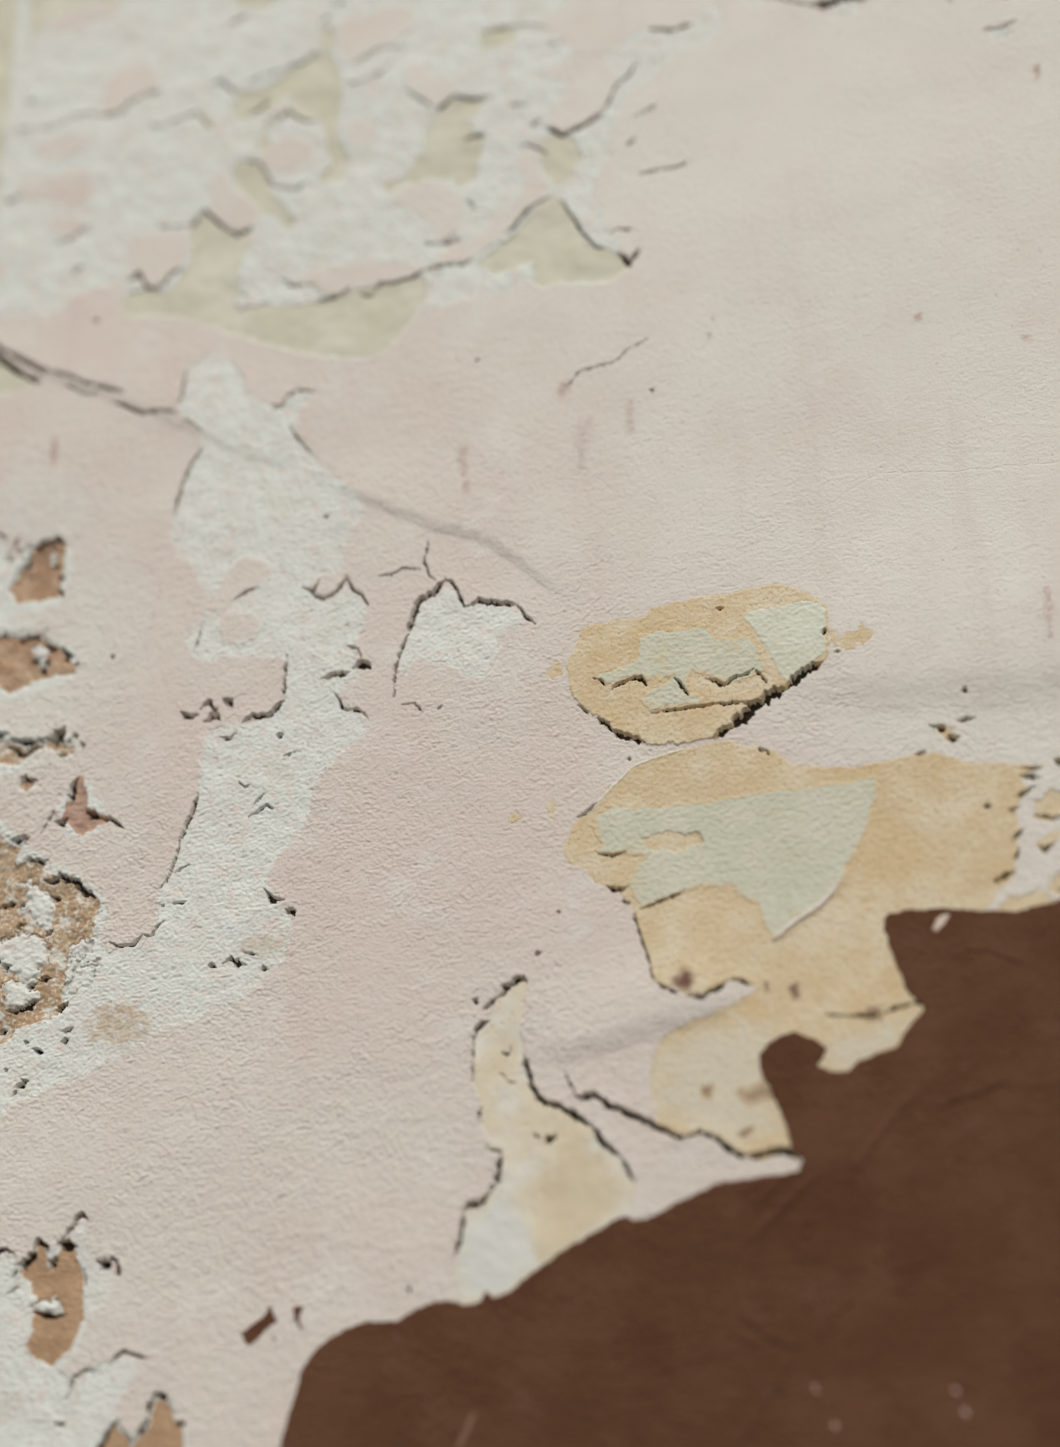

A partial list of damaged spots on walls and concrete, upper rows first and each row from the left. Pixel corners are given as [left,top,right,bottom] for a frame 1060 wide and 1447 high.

peeling [782,0,869,18]
peeling [0,0,737,358]
crack [0,348,201,432]
peeling [0,352,374,1111]
peeling [390,543,535,693]
peeling [545,584,1060,1163]
peeling [454,978,636,1305]
peeling [0,1212,186,1447]